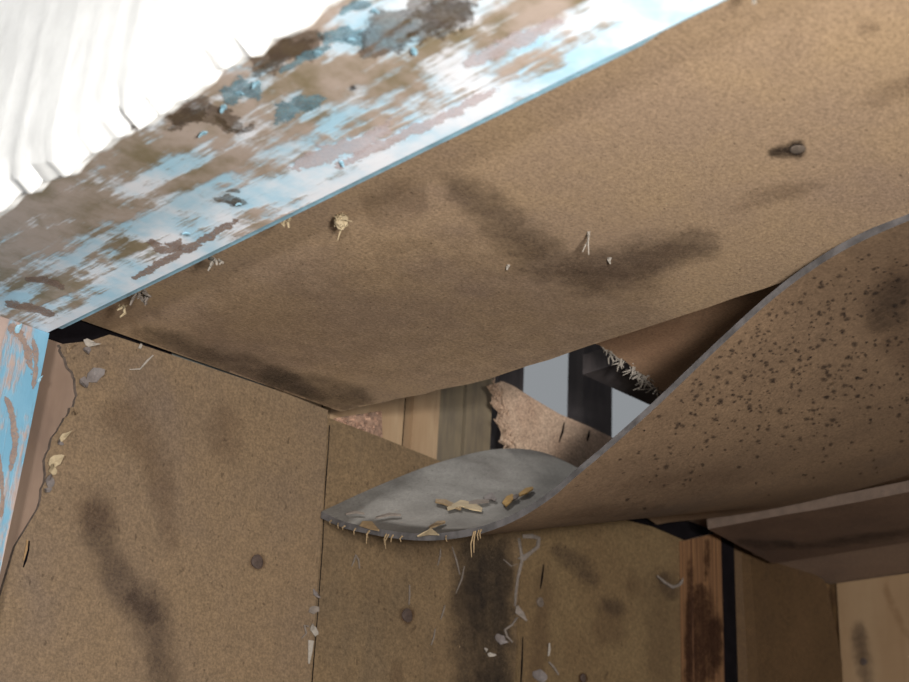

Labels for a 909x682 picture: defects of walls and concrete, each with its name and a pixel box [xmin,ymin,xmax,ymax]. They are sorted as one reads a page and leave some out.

peeling [164,0,479,138]
peeling [461,18,564,68]
peeling [287,88,497,171]
peeling [131,219,239,280]
peeling [5,300,58,318]
peeling [25,276,64,290]
leakage [685,569,695,682]
crack [517,637,525,682]